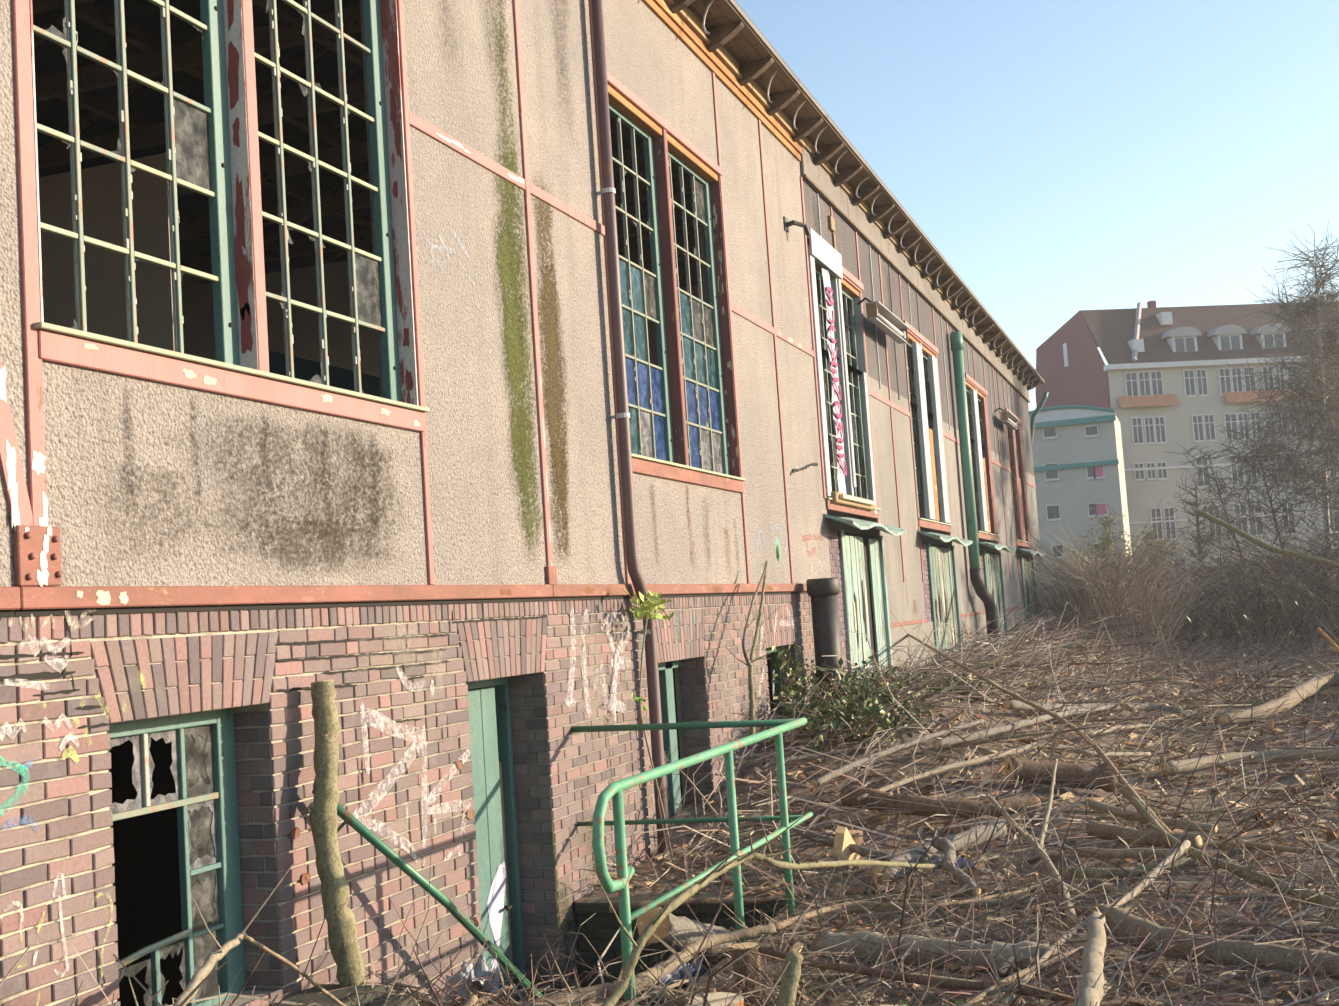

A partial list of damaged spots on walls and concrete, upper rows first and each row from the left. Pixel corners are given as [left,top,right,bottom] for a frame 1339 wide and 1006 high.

peeling [227,0,240,147]
peeling [390,88,402,161]
peeling [235,173,253,354]
damp [486,4,569,554]
peeling [183,368,217,385]
peeling [405,370,414,392]
peeling [6,439,52,587]
peeling [77,590,128,605]